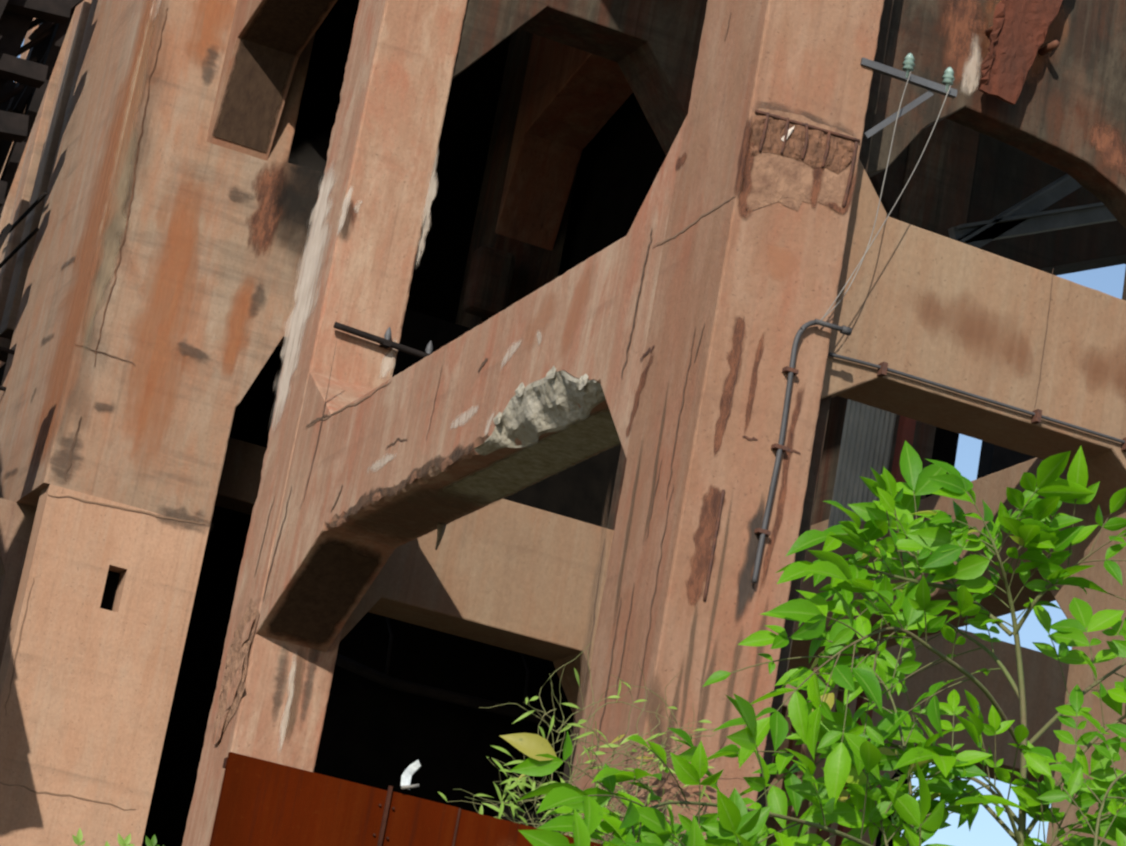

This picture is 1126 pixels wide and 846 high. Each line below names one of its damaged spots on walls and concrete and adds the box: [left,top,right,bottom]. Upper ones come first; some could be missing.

rust [248,165,286,253]
spalling [735,108,860,217]
rust [1091,126,1126,176]
crack [621,196,735,378]
crack [75,344,136,366]
rust [714,317,764,455]
spalling [330,366,606,528]
damp [269,540,380,645]
rust [687,487,725,605]
damp [281,658,302,739]
crack [0,782,136,810]